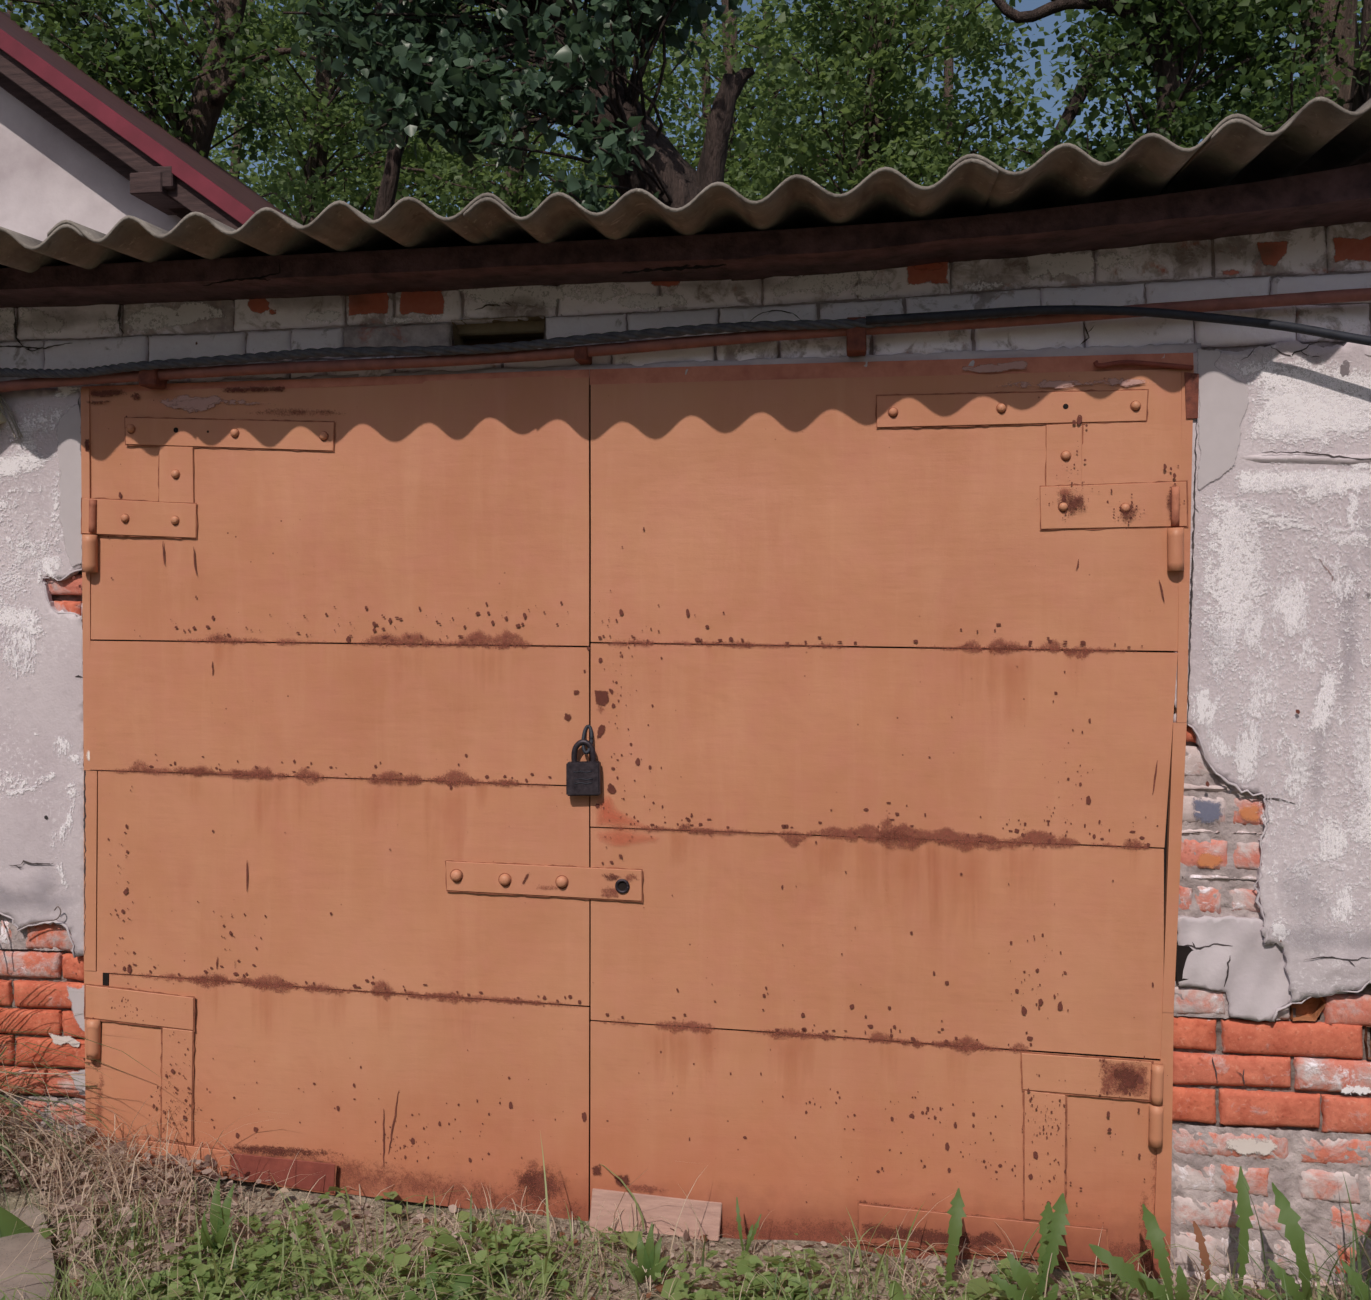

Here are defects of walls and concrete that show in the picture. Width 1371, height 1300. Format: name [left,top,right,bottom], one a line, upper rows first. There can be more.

crack [1262,451,1371,460]
rust [349,611,527,648]
rust [598,635,857,648]
rust [938,623,1143,658]
peeling [1178,352,1371,944]
rust [116,754,551,787]
peeling [0,733,79,888]
rust [614,802,1150,851]
rust [131,960,581,1005]
spalling [0,912,86,1140]
rust [761,1024,1033,1053]
spalling [1170,944,1371,1289]